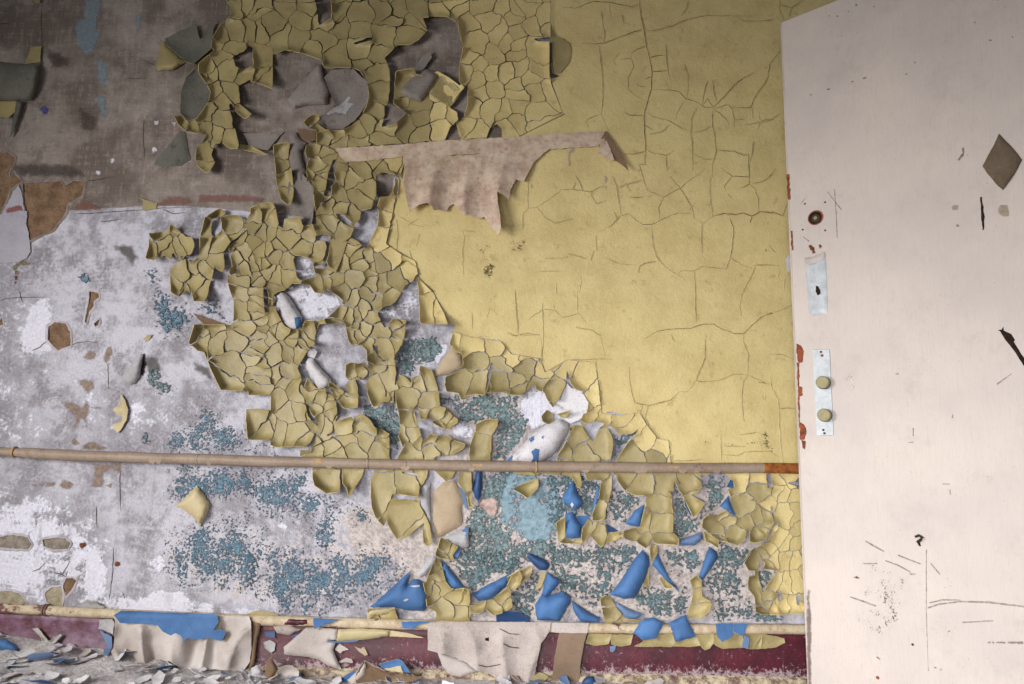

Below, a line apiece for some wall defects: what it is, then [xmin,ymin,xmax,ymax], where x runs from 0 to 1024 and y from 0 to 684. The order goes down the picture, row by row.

flaking render [0,150,88,243]
crack [390,215,425,270]
crack [451,0,802,463]
flaking render [45,288,102,353]
peeling [145,0,806,629]
flaking render [0,533,73,553]
flaking render [0,589,28,604]
flaking render [43,576,79,606]
peeling [98,619,115,649]
peeling [251,618,340,680]
peeling [335,644,421,684]
peeling [586,575,785,652]